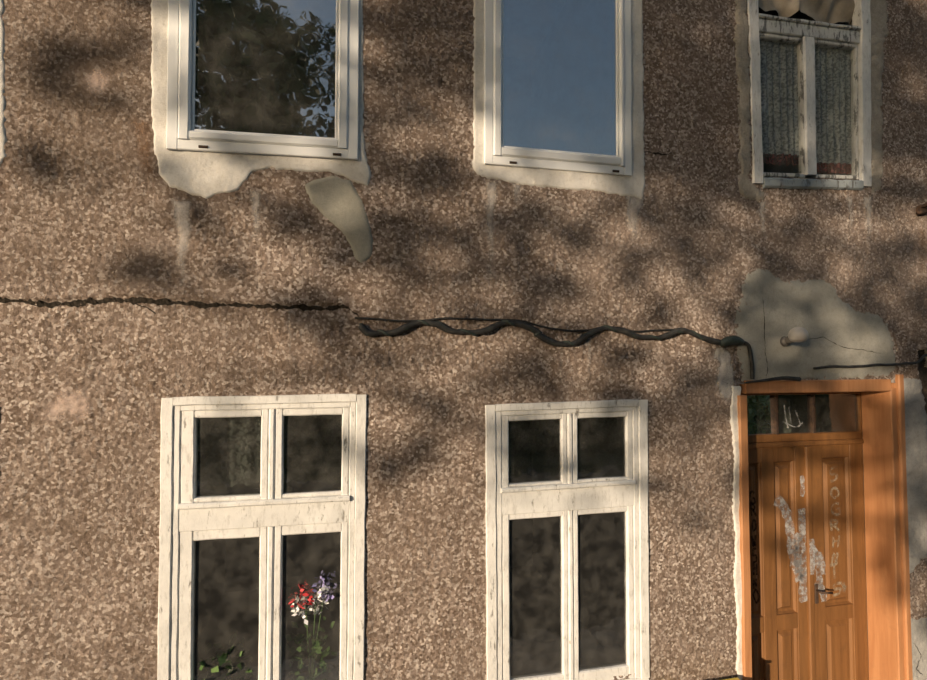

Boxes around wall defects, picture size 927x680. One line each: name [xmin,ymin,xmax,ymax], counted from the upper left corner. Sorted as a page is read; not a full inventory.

crack [0,297,359,317]
flaking render [911,618,927,680]